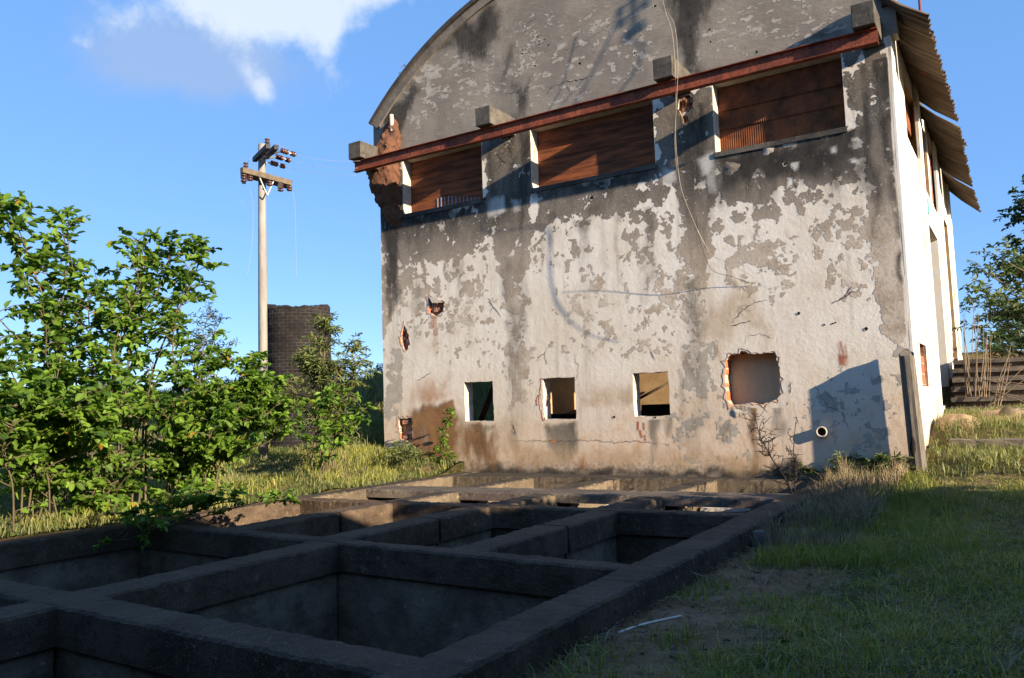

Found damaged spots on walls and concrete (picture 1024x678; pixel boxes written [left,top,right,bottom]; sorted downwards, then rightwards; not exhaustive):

peeling [403,5,659,140]
damp [873,57,891,122]
peeling [381,43,909,465]